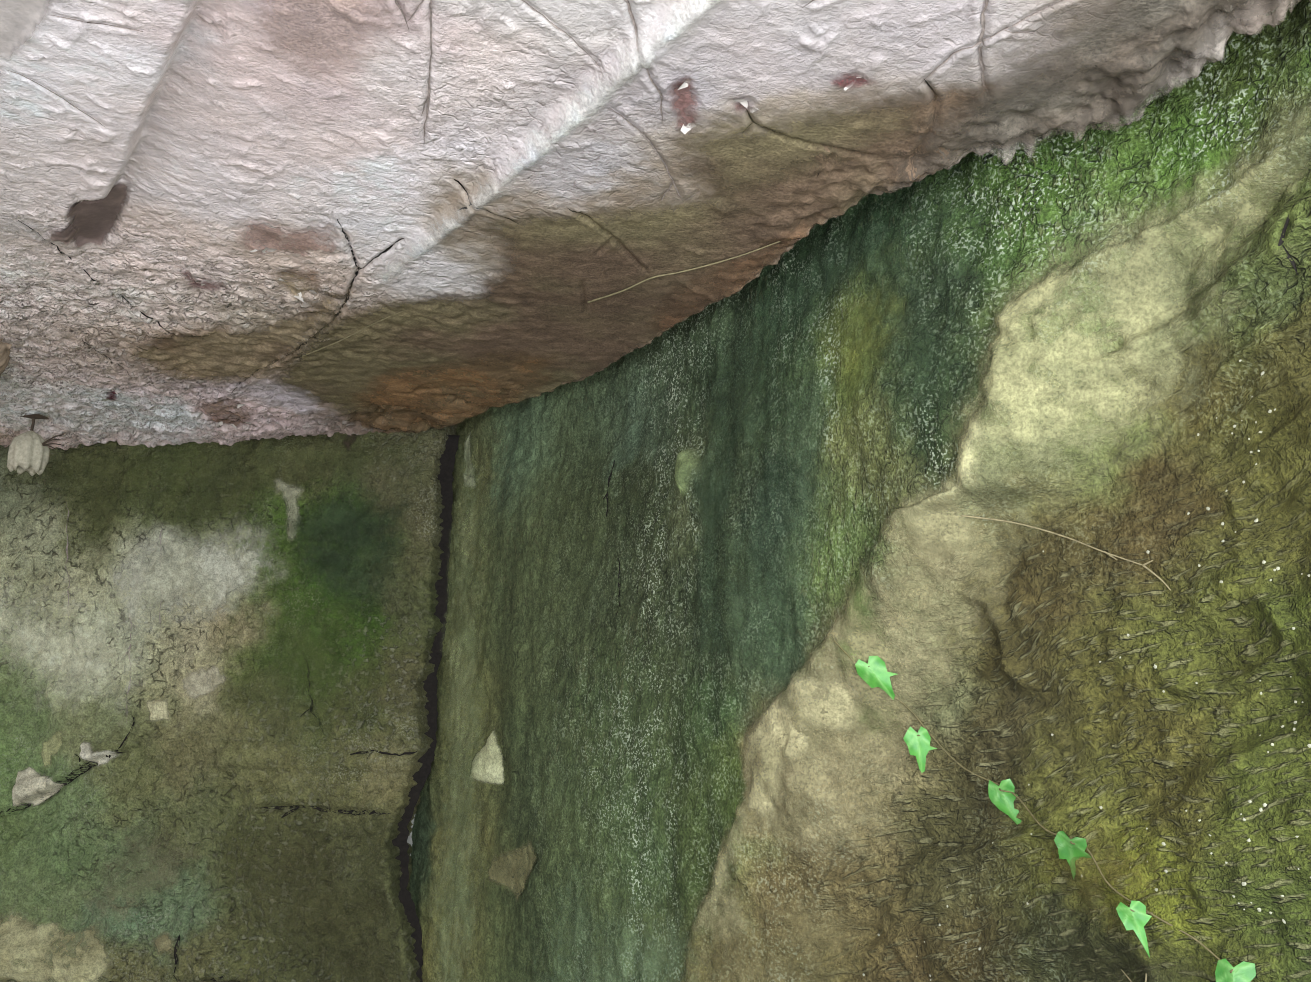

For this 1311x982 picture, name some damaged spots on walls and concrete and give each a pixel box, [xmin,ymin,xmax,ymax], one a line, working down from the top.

peeling [0,0,50,59]
crack [395,0,432,143]
crack [522,0,700,202]
spalling [50,184,128,248]
crack [230,219,404,395]
corrosion [655,232,802,331]
water stain [51,439,366,538]
water stain [122,543,253,621]
water stain [0,613,108,675]
crack [264,435,460,982]
water stain [441,475,477,982]
spalling [0,915,107,982]